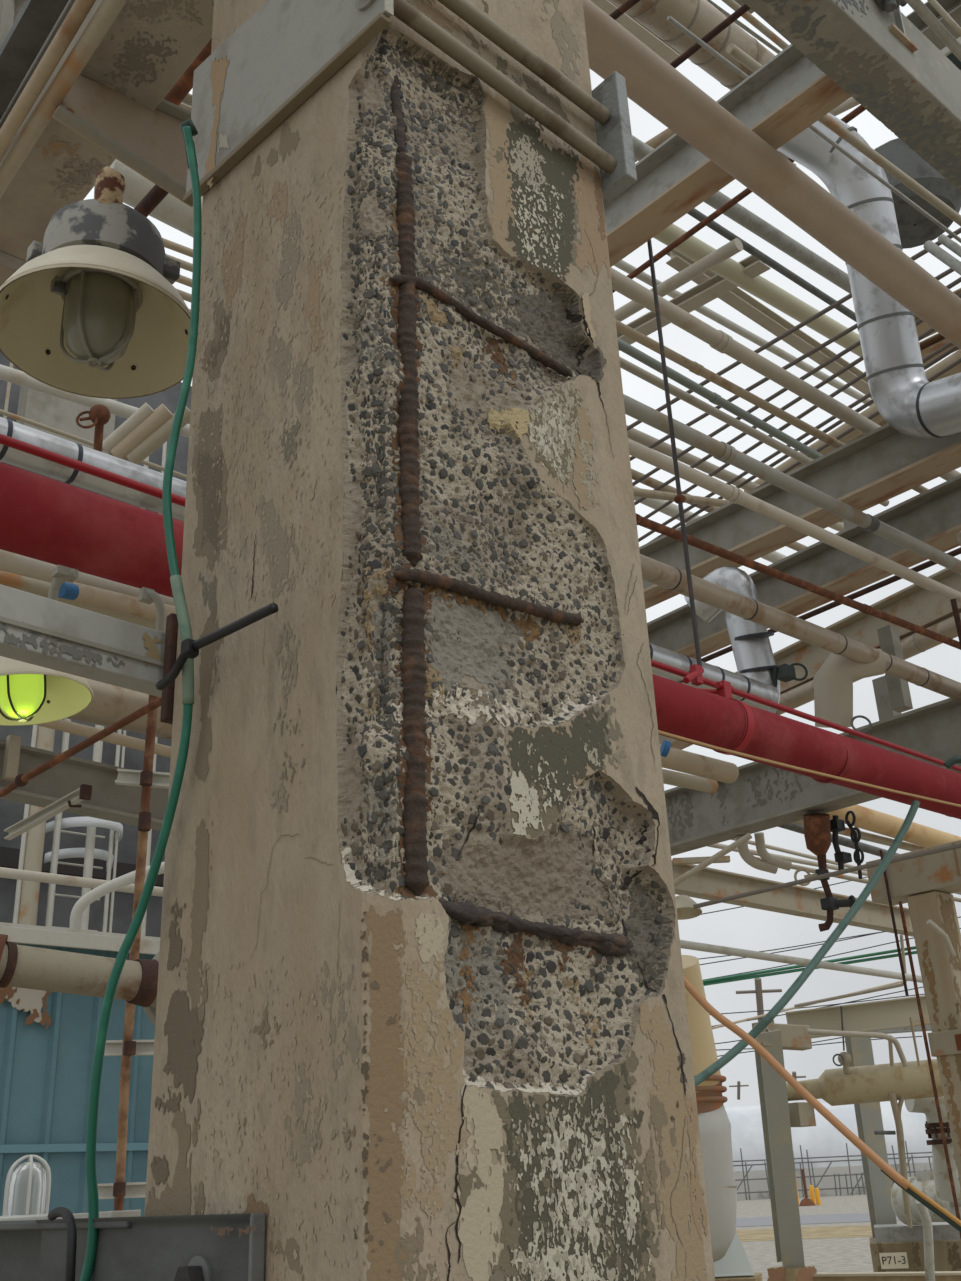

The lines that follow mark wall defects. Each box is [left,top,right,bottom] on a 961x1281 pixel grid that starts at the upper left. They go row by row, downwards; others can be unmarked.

corrosion [357,156,546,899]
crack [446,1085,467,1281]
spalling [336,26,675,1281]
corrosion [454,907,630,1054]
crack [625,563,637,615]
crack [592,643,687,1281]